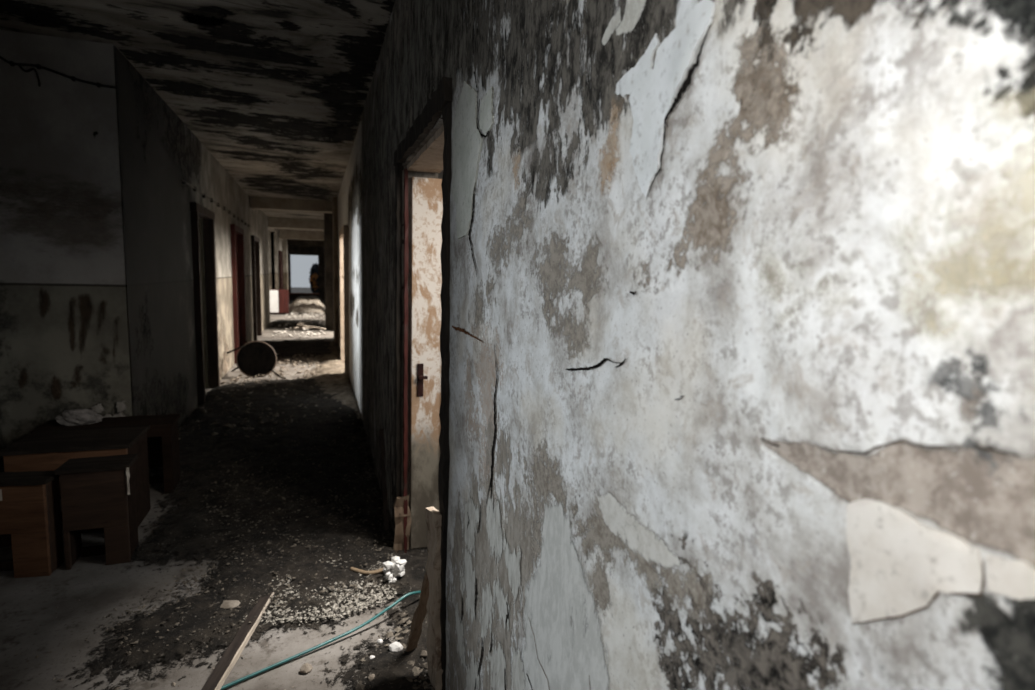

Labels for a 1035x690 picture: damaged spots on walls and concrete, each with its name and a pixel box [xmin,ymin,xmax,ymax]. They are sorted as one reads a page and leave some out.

water stain [0,0,395,201]
crack [474,72,494,137]
peeling [602,0,646,45]
peeling [615,0,715,199]
crack [646,16,713,200]
crack [468,182,477,276]
crack [565,358,625,371]
water stain [523,441,849,690]
spalling [762,439,1035,623]